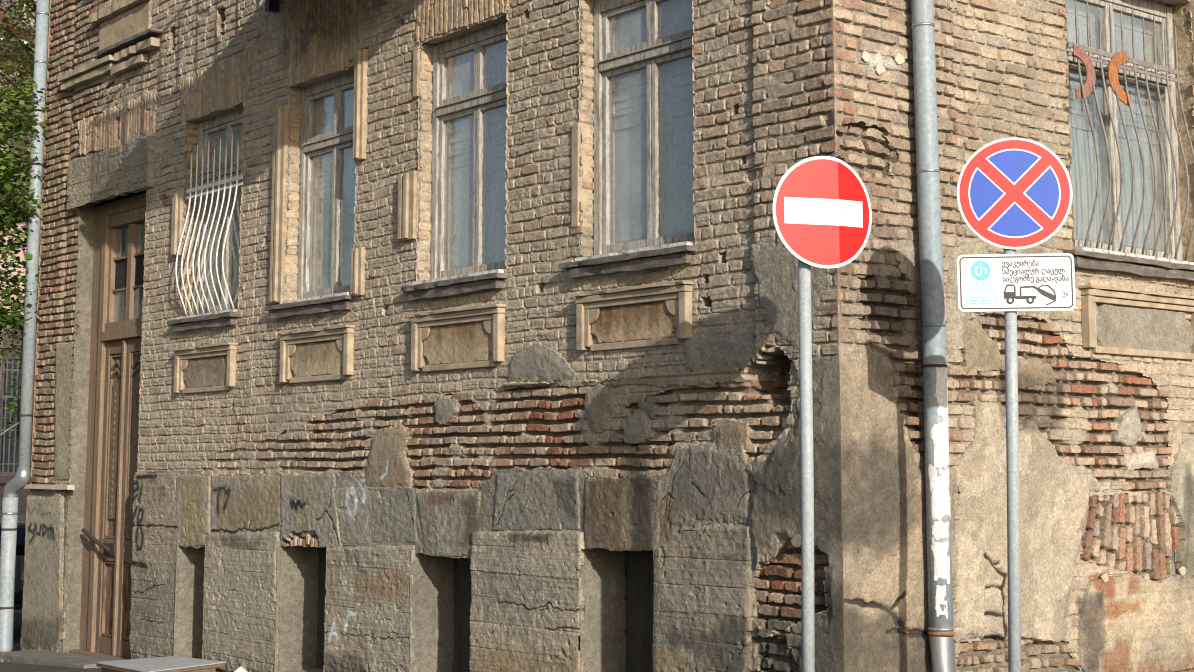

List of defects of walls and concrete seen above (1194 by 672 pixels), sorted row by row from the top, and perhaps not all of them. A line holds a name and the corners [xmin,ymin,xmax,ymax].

spalling [835,121,899,179]
spalling [201,237,831,541]
flaking render [839,238,933,672]
flaking render [945,240,1194,672]
spalling [287,530,319,547]
crack [500,601,584,631]
spalling [749,540,829,672]
crack [844,592,929,638]
crack [983,554,1007,640]